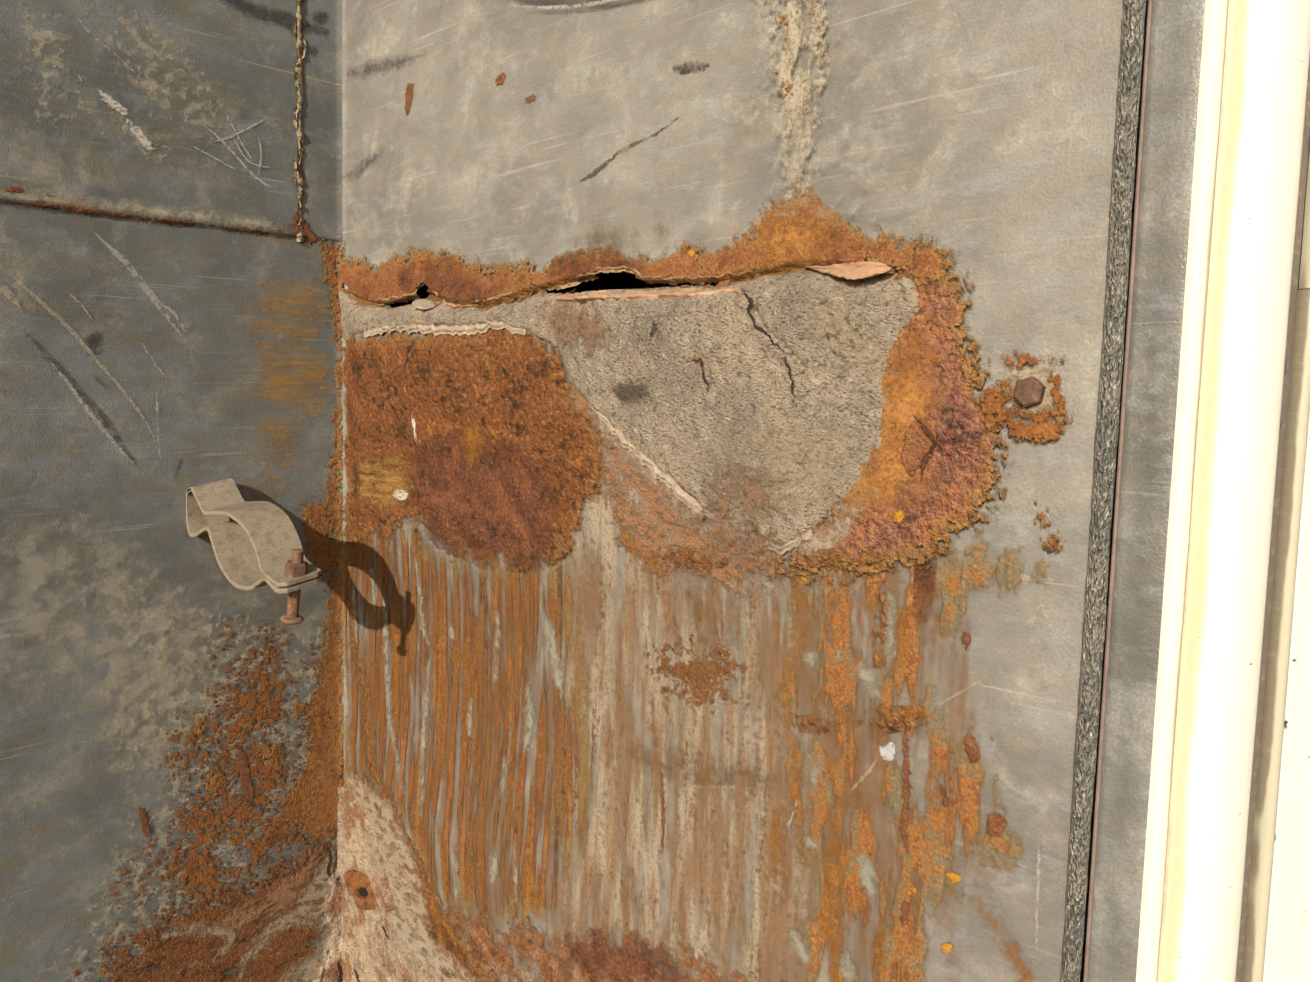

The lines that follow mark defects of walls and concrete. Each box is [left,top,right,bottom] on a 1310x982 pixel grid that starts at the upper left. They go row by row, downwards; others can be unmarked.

rust [674,63,709,75]
damp [759,0,838,200]
rust [4,185,196,227]
crack [369,263,797,403]
crack [820,308,866,354]
spalling [338,261,920,565]
rust [65,119,1073,982]